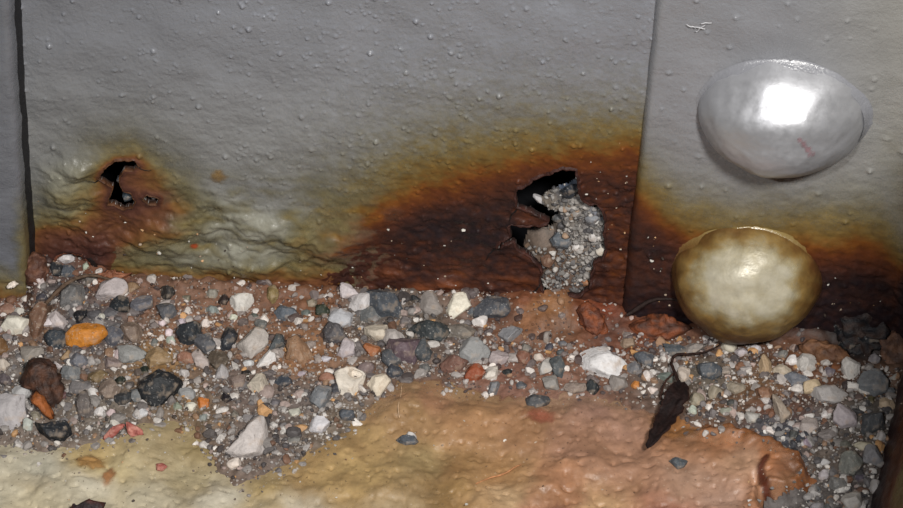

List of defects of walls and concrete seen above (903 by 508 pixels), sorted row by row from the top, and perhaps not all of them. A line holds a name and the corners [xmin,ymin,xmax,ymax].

rust [0,110,903,345]
rust [77,456,115,484]
rust [298,383,817,508]
rust [871,373,903,508]